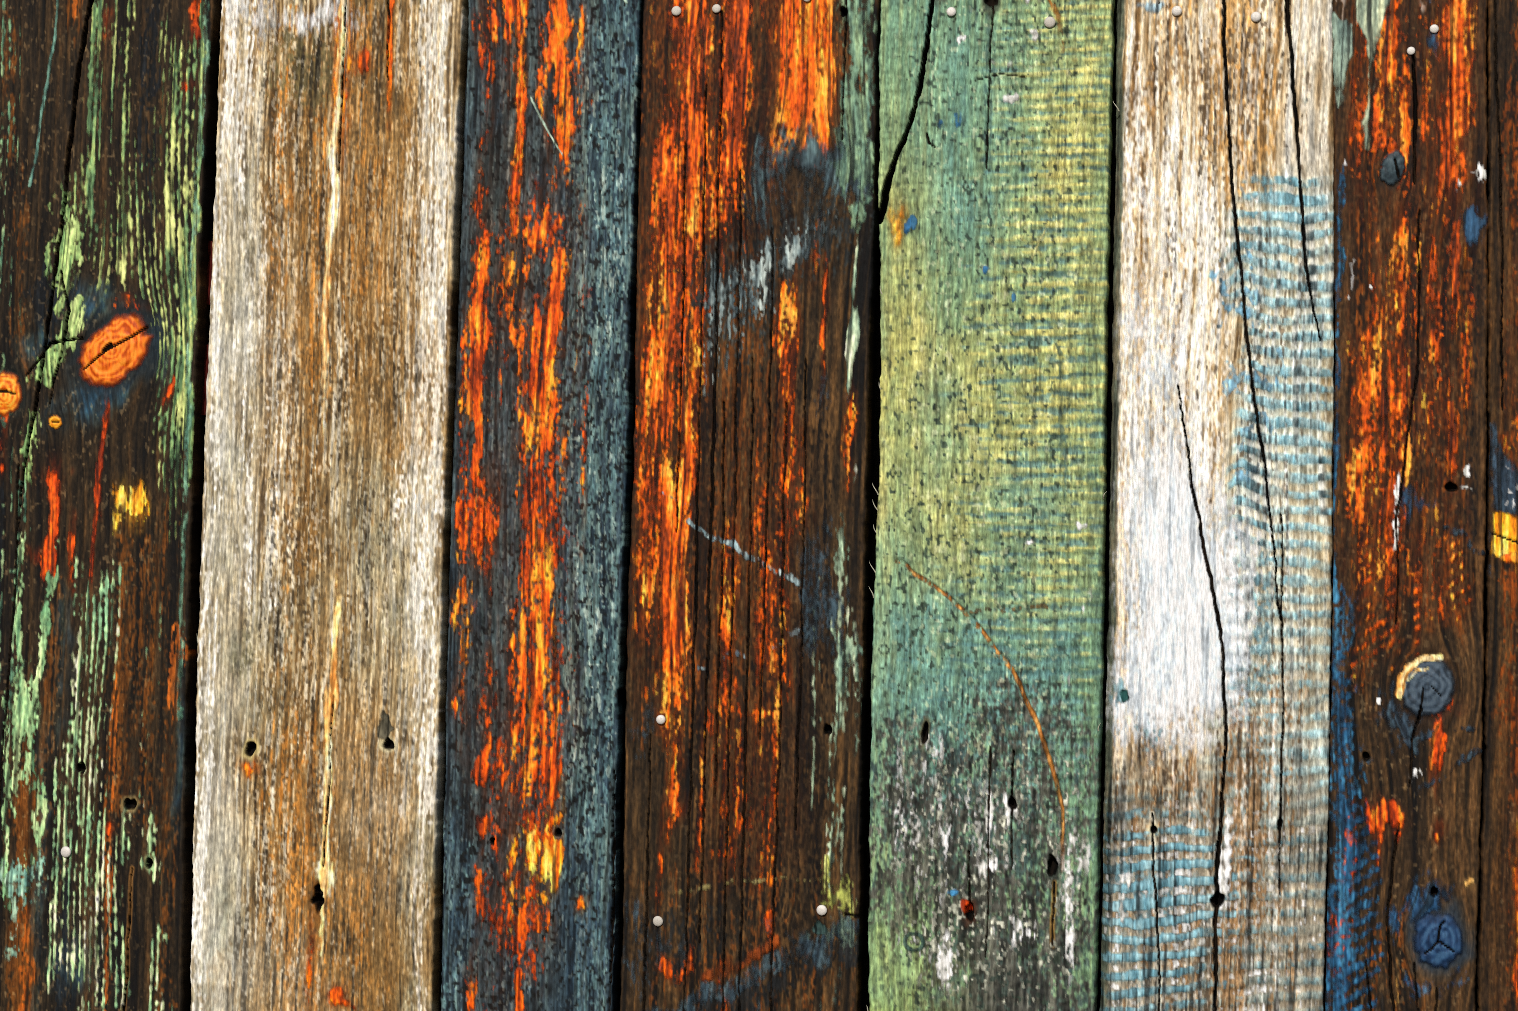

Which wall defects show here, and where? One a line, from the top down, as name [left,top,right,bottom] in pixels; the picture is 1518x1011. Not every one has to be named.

peeling [0,0,210,1011]
peeling [451,0,588,1011]
peeling [659,910,779,1011]
peeling [633,0,875,914]
crack [880,0,935,224]
peeling [894,735,1259,1011]
crack [1177,386,1228,1011]
crack [1222,0,1284,895]
crack [1285,0,1321,341]
peeling [1209,0,1487,1011]